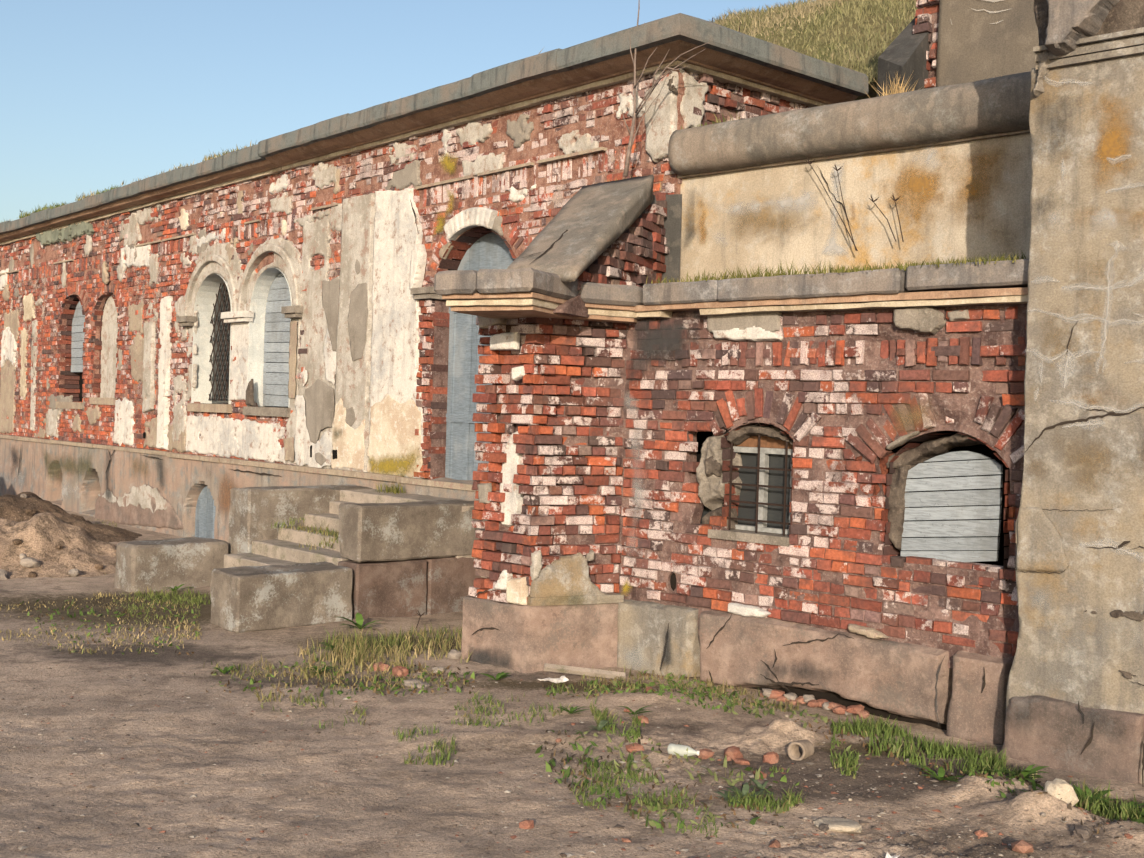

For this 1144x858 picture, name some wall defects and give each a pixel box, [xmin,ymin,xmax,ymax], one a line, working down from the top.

peeling [614,69,709,163]
peeling [442,114,534,178]
peeling [558,130,599,159]
peeling [0,141,454,479]
peeling [478,316,520,350]
peeling [511,366,526,381]
crack [1025,407,1144,452]
peeling [477,431,524,527]
crack [1087,541,1144,550]
crack [760,633,854,693]
crack [1078,701,1095,755]
crack [1136,744,1144,787]